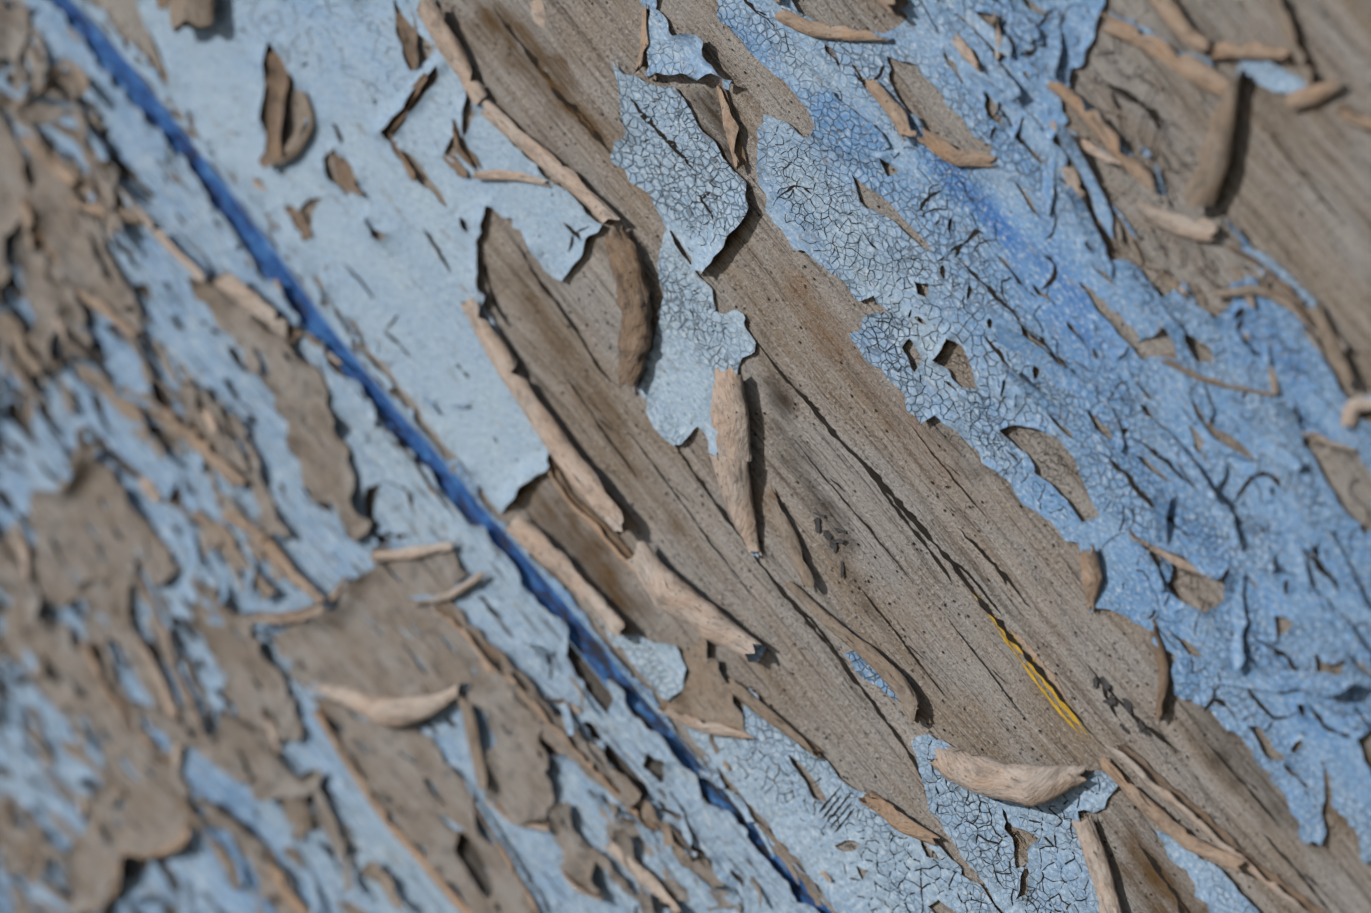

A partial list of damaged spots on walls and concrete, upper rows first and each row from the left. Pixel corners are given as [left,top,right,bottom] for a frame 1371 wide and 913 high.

crack [629,96,713,220]
crack [854,61,889,83]
crack [988,102,1026,148]
crack [1020,5,1059,57]
crack [1102,80,1165,130]
crack [920,190,941,210]
crack [1041,207,1058,290]
crack [949,228,1076,378]
peeling [73,0,1118,913]
peeling [610,0,1371,866]
crack [745,325,1351,913]
peeling [1155,830,1260,913]